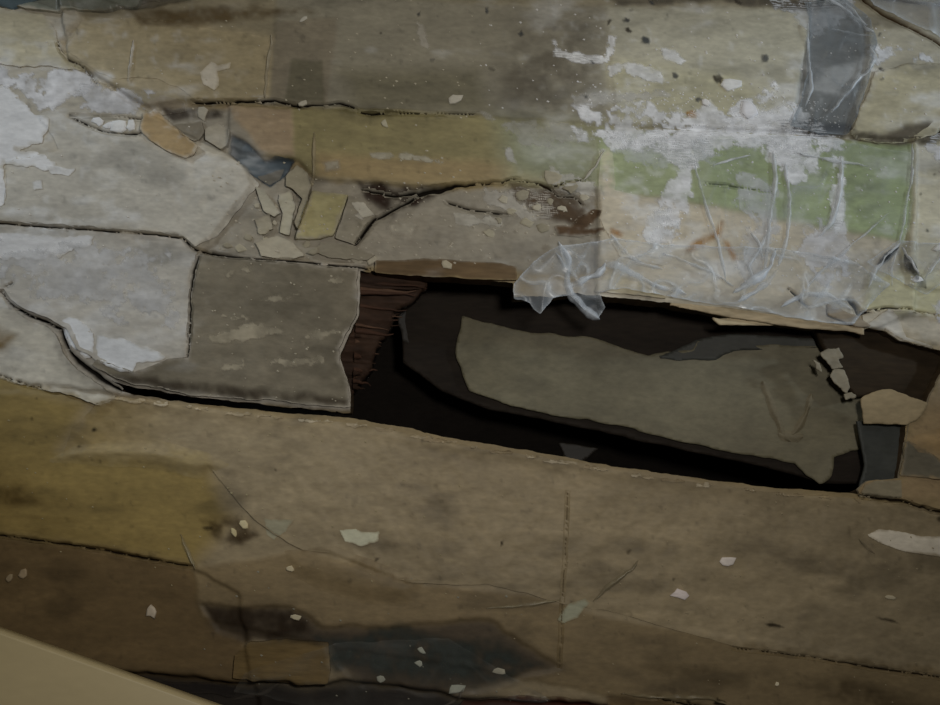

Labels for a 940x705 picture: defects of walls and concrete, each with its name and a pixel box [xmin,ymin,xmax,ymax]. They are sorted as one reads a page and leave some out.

water stain [728,0,857,36]
crack [860,0,940,48]
water stain [867,44,902,70]
peeling [0,85,75,206]
spalling [231,137,294,186]
water stain [572,48,940,288]
crack [0,175,592,356]
spalling [62,313,858,493]
crack [859,493,940,515]
crack [0,532,195,570]
water stain [231,529,250,542]
peeling [868,529,940,557]